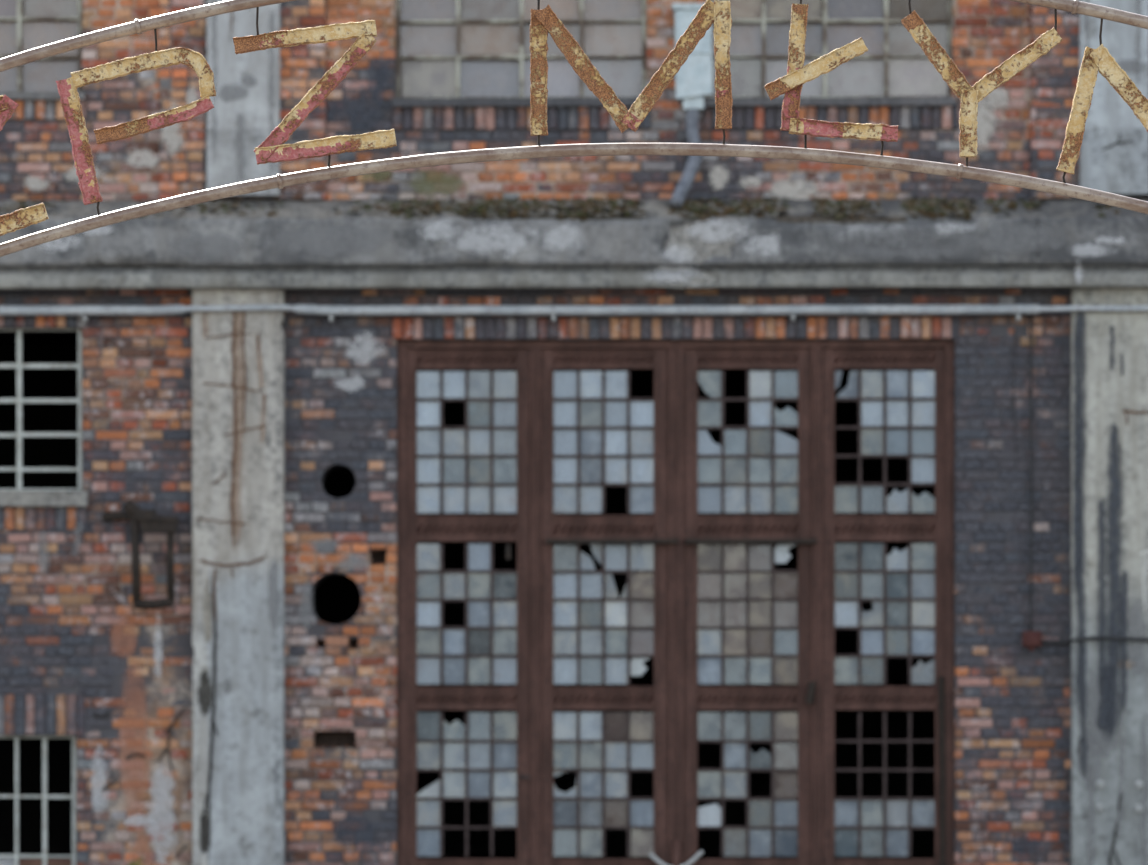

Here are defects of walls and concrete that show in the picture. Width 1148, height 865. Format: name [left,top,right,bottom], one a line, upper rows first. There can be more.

leakage [40,226,113,252]
leakage [418,222,581,257]
leakage [649,245,695,283]
leakage [691,220,779,256]
leakage [835,223,1123,283]
leakage [1073,311,1146,864]